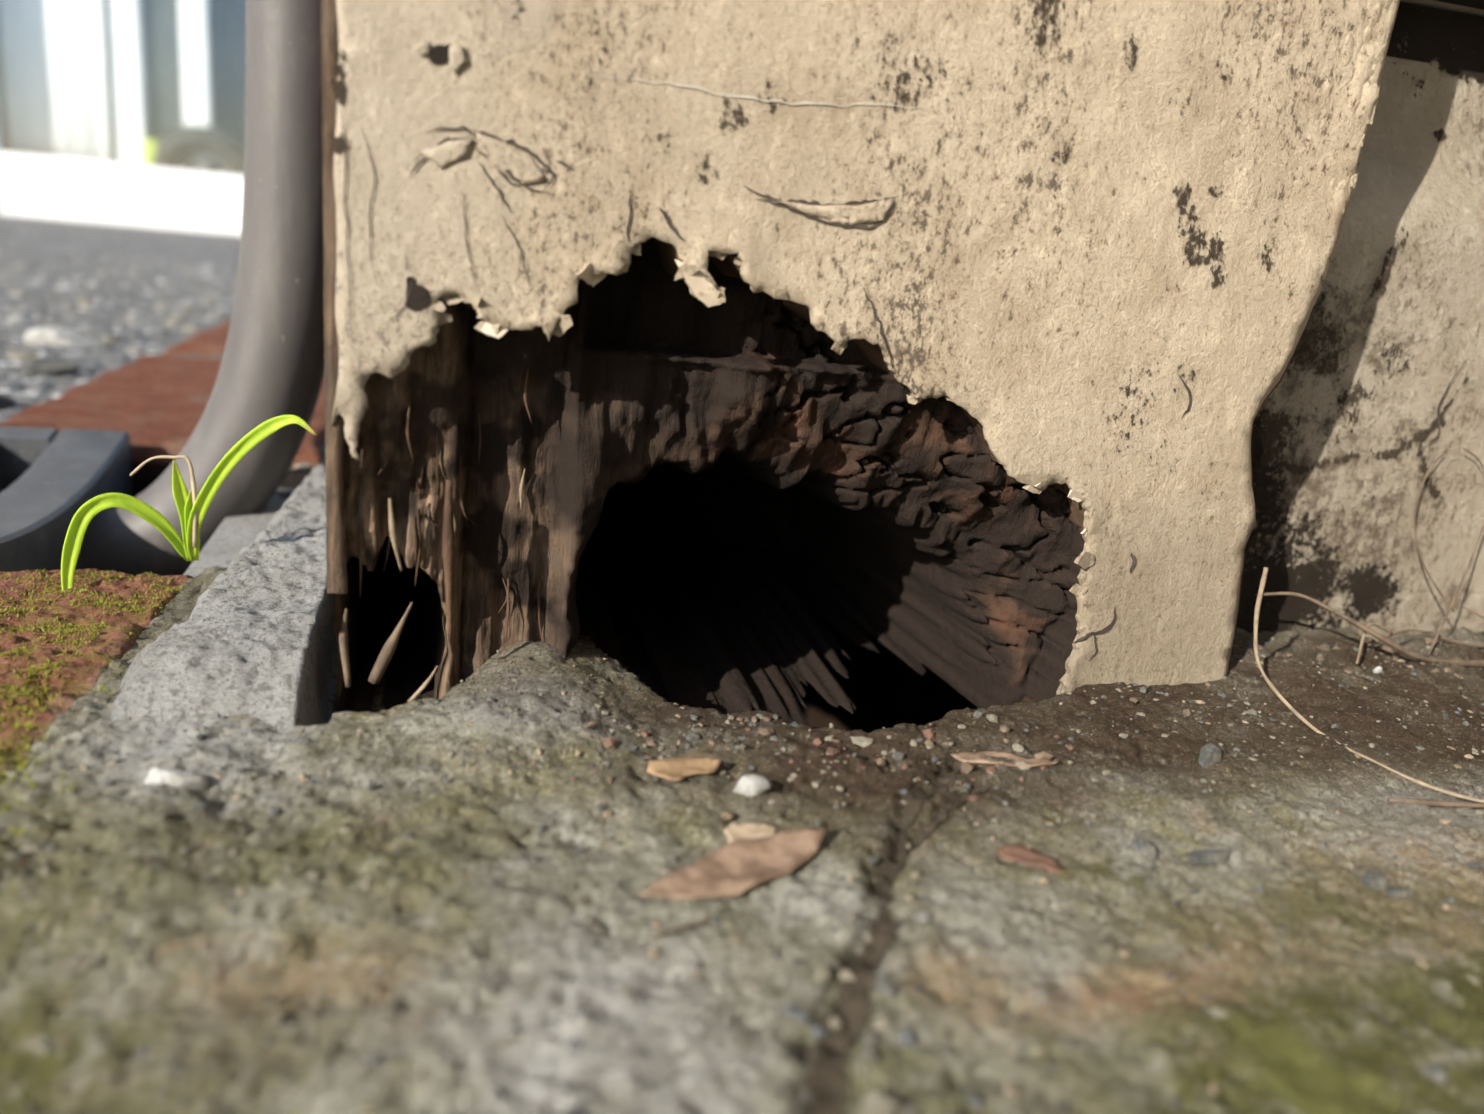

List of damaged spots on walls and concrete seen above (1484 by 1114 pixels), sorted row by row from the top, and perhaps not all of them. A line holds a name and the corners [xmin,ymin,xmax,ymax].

leakage [1150,182,1228,298]
peeling [575,263,606,287]
peeling [674,250,742,307]
peeling [406,276,509,339]
peeling [550,311,573,337]
peeling [831,342,847,355]
leakage [1236,215,1469,634]
peeling [1022,483,1047,494]
peeling [1068,489,1083,502]
peeling [1069,528,1095,597]
crack [792,741,994,1114]